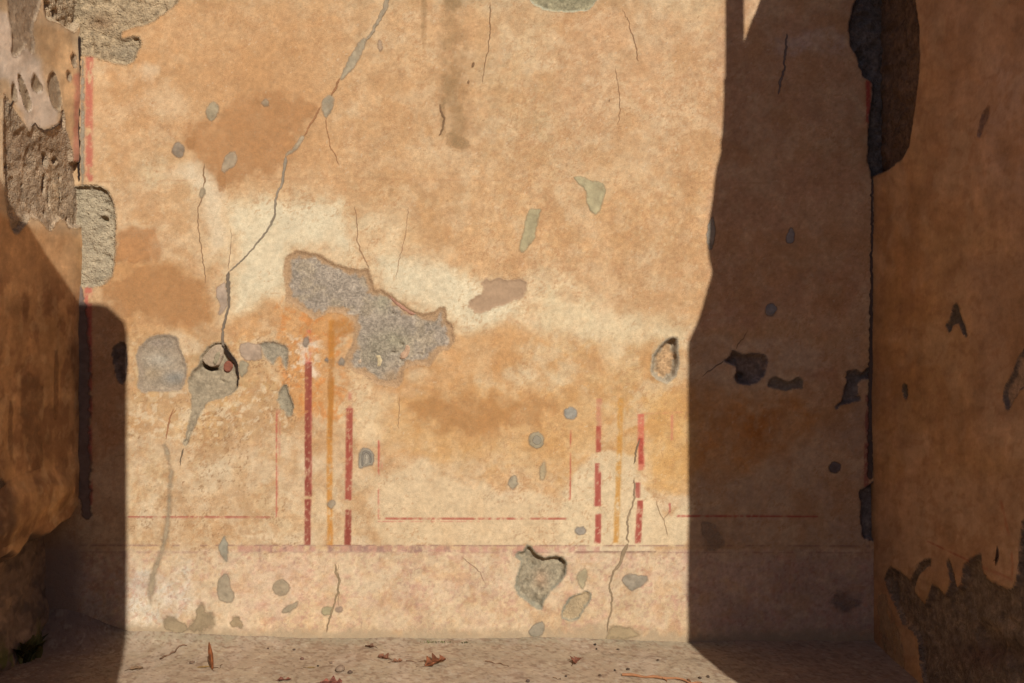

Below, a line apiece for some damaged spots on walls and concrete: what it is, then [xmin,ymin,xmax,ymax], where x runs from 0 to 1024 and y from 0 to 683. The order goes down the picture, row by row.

crack [366,0,389,40]
spalling [3,0,180,289]
crack [304,78,340,164]
spalling [110,333,240,447]
crack [197,157,287,386]
crack [354,207,369,267]
spalling [282,249,456,389]
peeling [467,276,528,315]
spalling [650,336,681,385]
spalling [514,543,568,611]
crack [607,439,669,631]
spalling [884,518,1024,683]